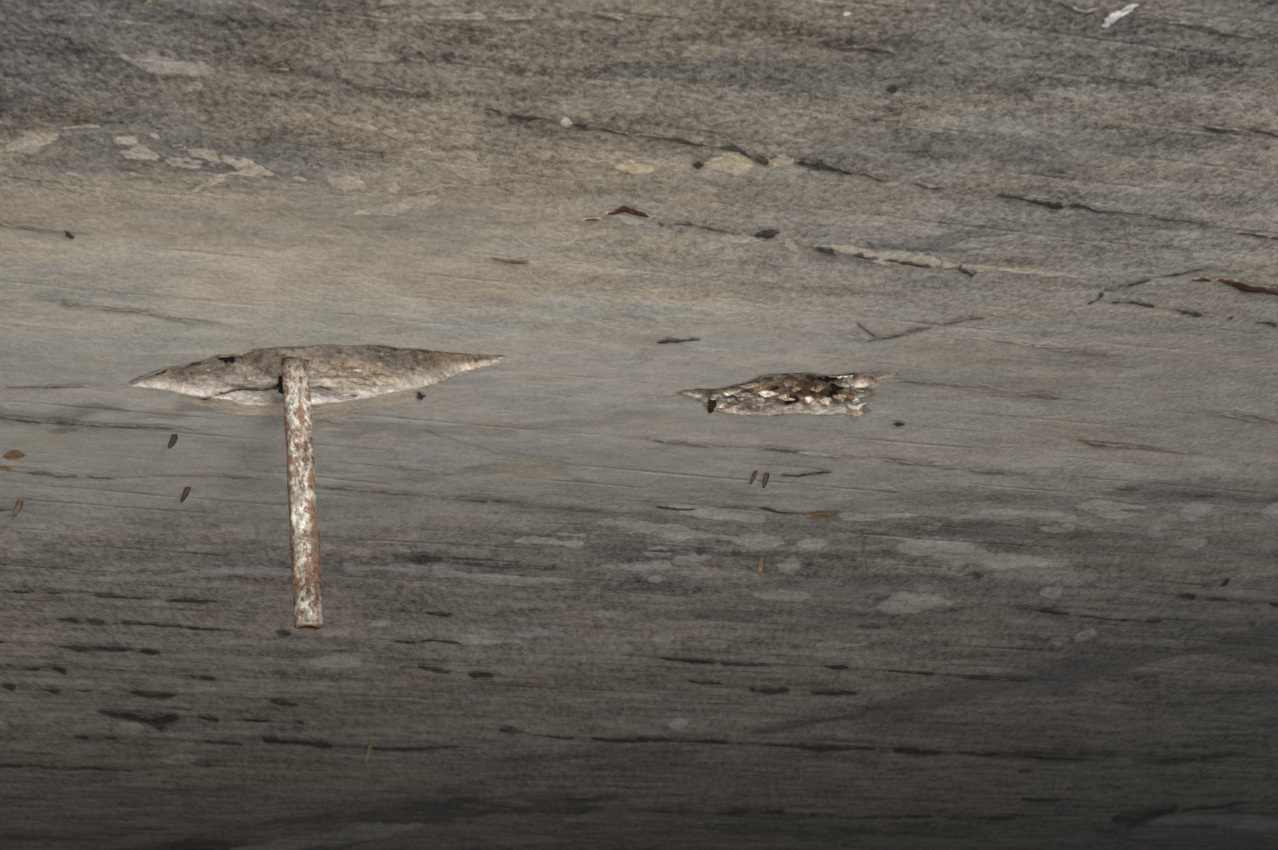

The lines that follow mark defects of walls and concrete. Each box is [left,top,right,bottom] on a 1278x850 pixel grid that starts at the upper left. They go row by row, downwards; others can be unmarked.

spalling [125,345,505,407]
spalling [677,372,900,417]